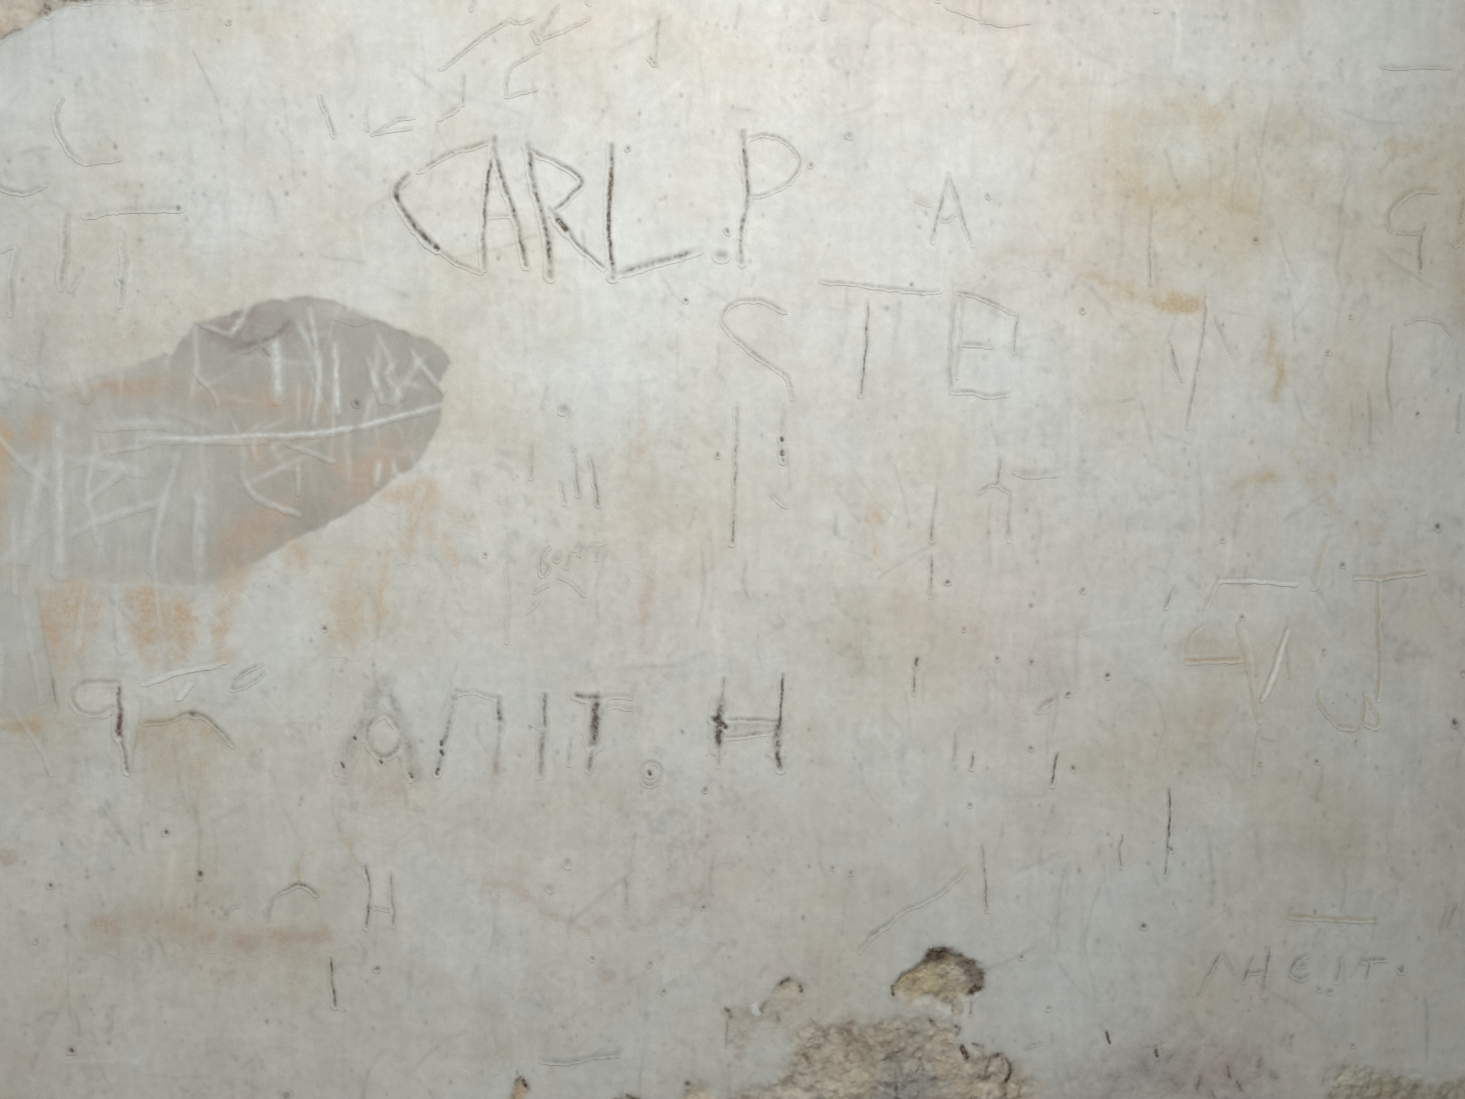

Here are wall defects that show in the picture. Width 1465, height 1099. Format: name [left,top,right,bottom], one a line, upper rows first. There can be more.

flaking render [0,0,212,46]
flaking render [673,940,1045,1099]
flaking render [1316,1043,1465,1099]